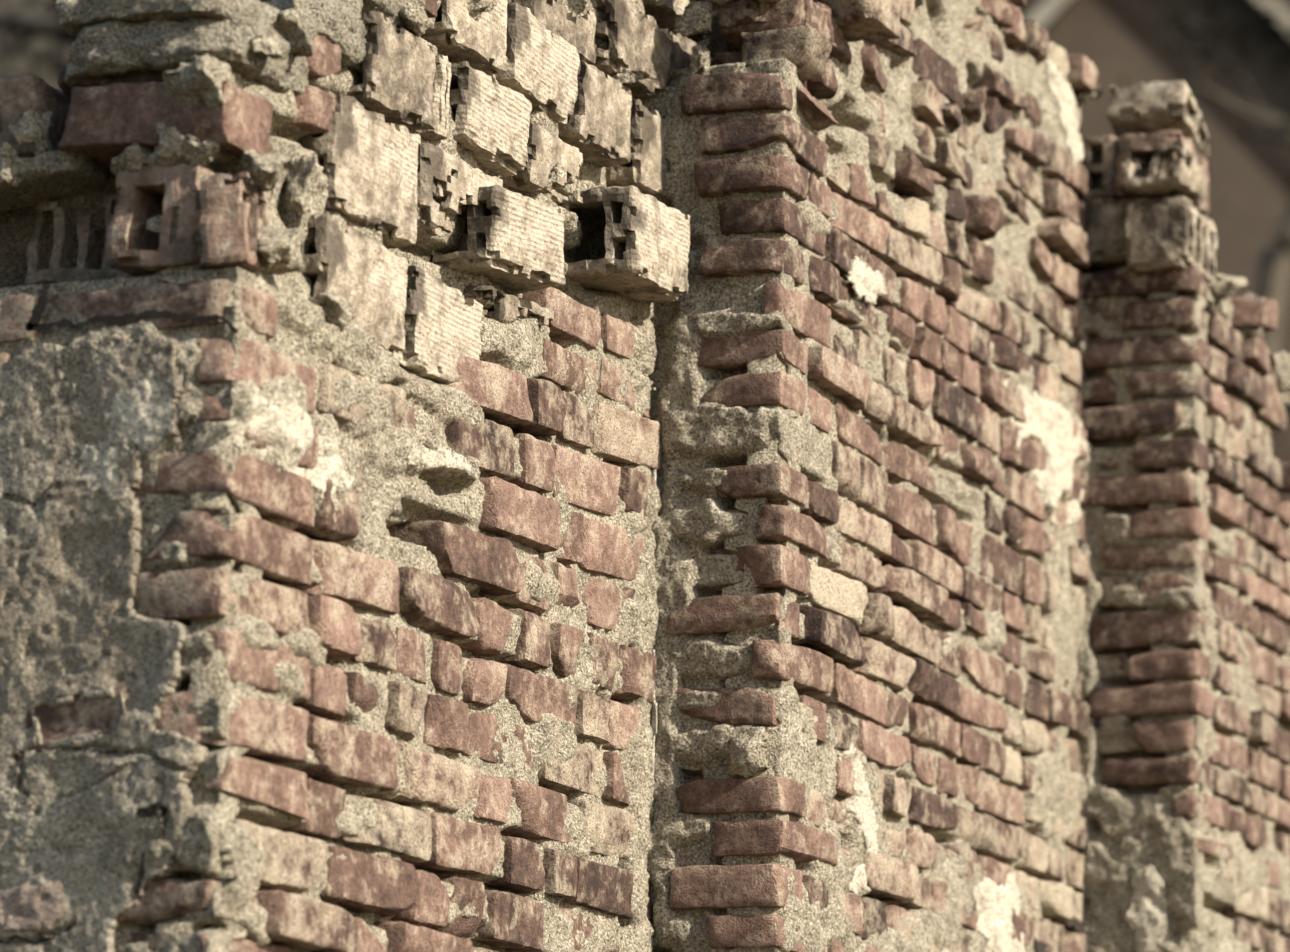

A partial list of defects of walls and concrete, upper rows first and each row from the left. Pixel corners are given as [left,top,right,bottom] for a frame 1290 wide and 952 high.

crack [2,481,60,507]
flaking render [1003,379,1088,527]
spalling [13,681,131,798]
crack [36,746,196,797]
crack [136,802,170,893]
flaking render [1125,865,1167,952]